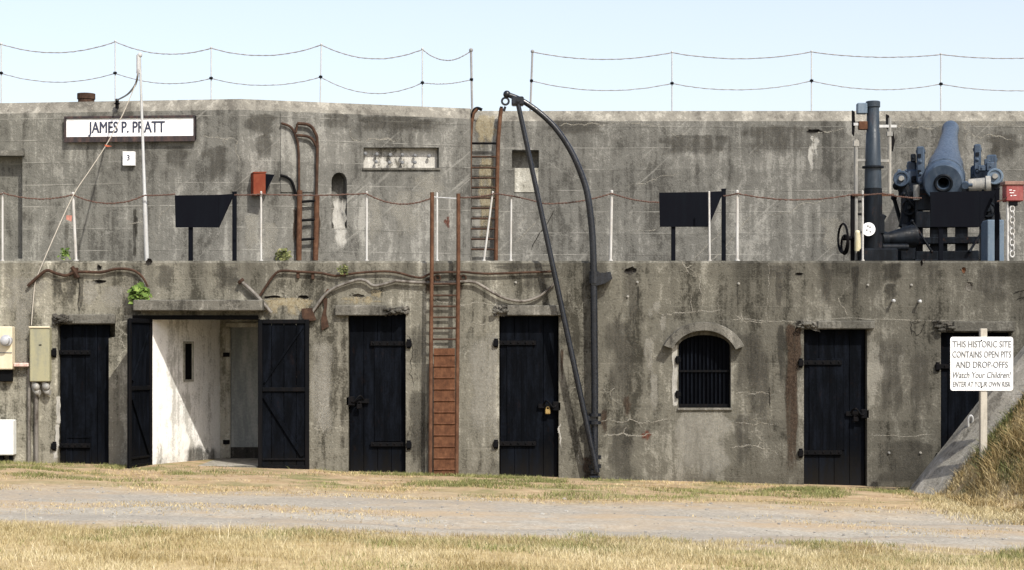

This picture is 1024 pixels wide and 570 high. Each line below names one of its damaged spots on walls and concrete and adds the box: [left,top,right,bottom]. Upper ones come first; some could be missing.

leakage [332,199,347,246]
crack [605,388,666,436]
corrosion [786,325,801,464]